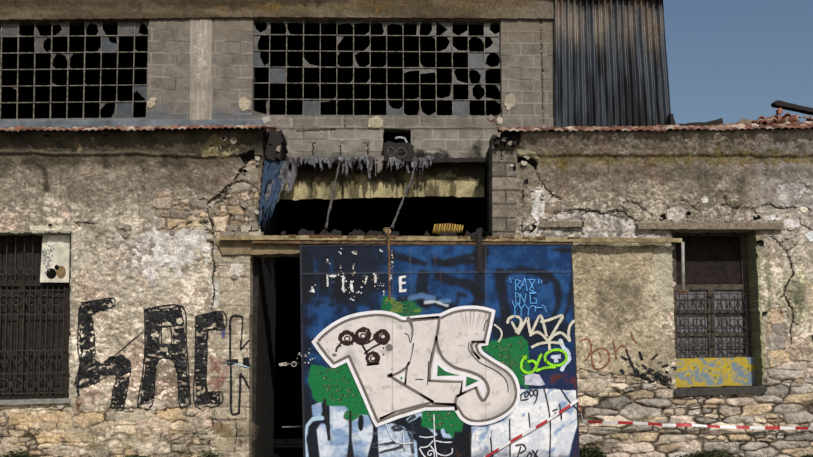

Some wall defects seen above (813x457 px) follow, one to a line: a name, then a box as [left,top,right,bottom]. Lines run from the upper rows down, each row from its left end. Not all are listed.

spalling [103,150,260,285]
crack [168,159,250,308]
spalling [510,156,538,171]
crack [520,165,652,233]
crack [762,198,813,344]